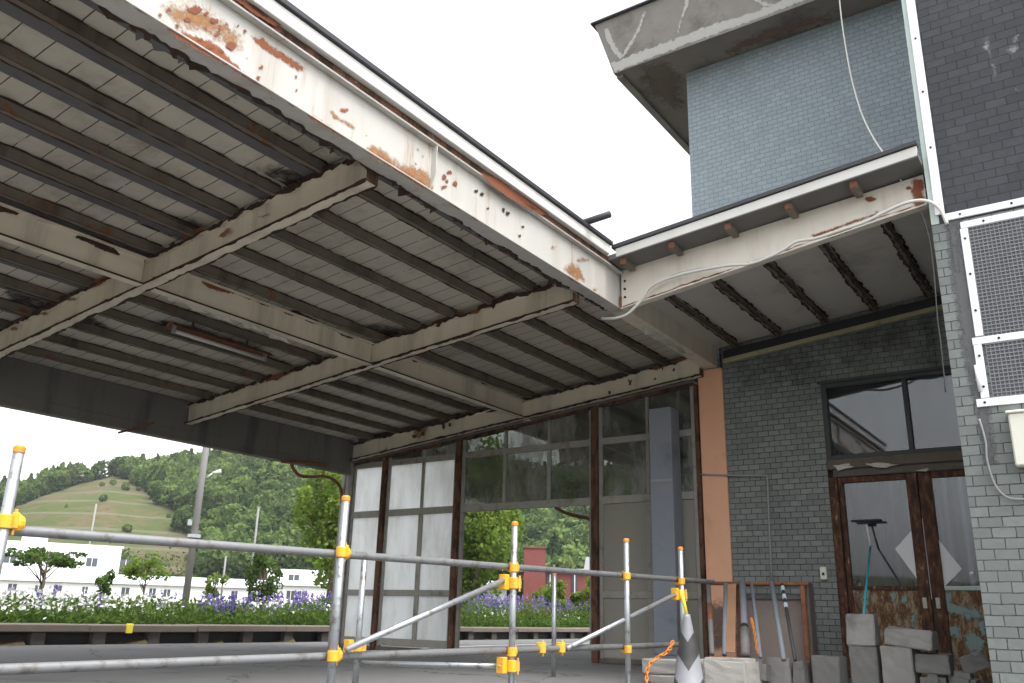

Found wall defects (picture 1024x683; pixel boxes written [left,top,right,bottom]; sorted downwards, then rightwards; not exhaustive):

peeling [98,6,205,72]
peeling [284,118,352,160]
rust [0,0,700,461]
peeling [392,182,438,214]
peeling [453,219,571,290]
rust [906,179,924,208]